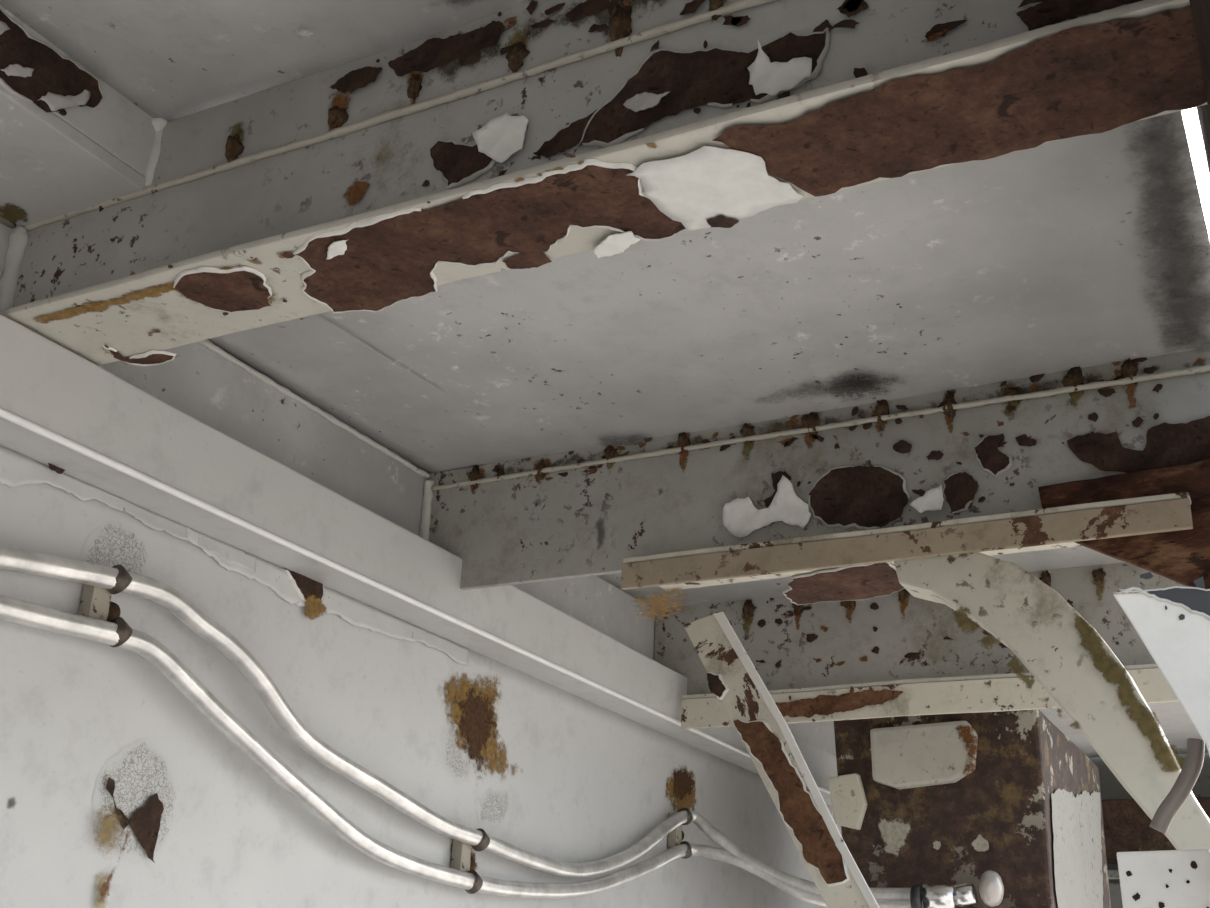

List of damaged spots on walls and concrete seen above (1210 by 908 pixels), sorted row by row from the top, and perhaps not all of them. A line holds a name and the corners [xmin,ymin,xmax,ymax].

peeling [0,10,104,116]
peeling [282,0,1207,314]
water stain [1130,117,1210,349]
peeling [168,264,287,316]
rust [1070,383,1084,406]
rust [1125,382,1136,408]
rust [678,433,690,470]
peeling [722,373,1046,538]
peeling [1062,412,1210,473]
spalling [96,778,164,863]
rust [440,674,516,826]
rust [666,768,696,811]